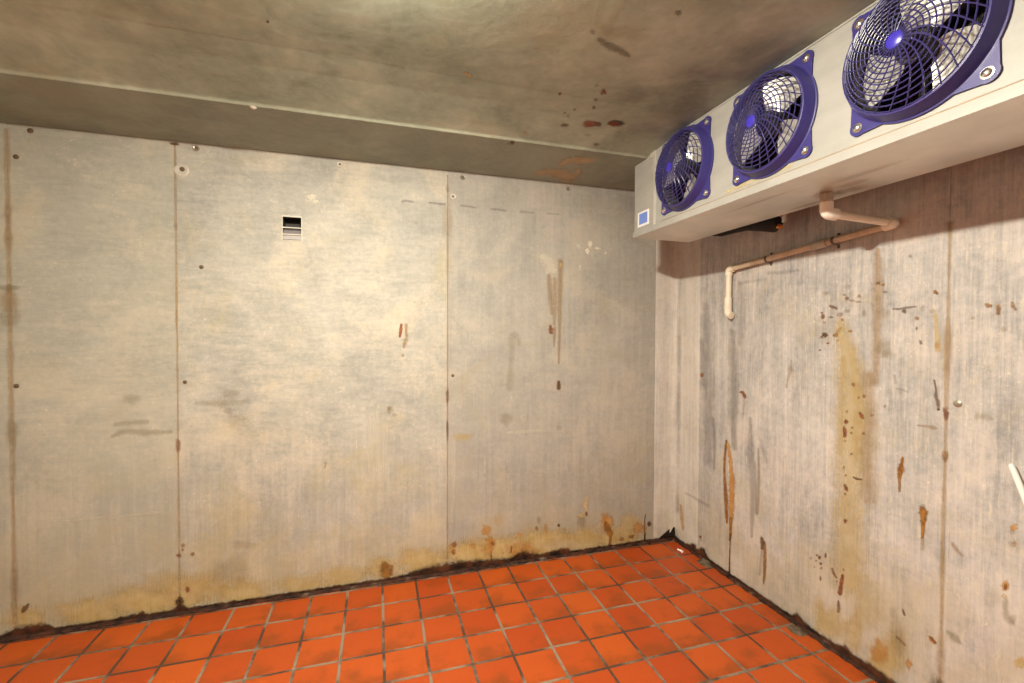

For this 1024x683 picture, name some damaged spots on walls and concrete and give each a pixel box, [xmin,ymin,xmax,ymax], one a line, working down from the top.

corrosion [584,106,624,127]
corrosion [0,129,896,683]
corrosion [919,506,927,538]
water stain [370,517,643,577]
water stain [9,608,42,626]
water stain [61,578,204,624]
water stain [221,578,262,602]
water stain [286,569,357,592]
water stain [870,642,896,677]